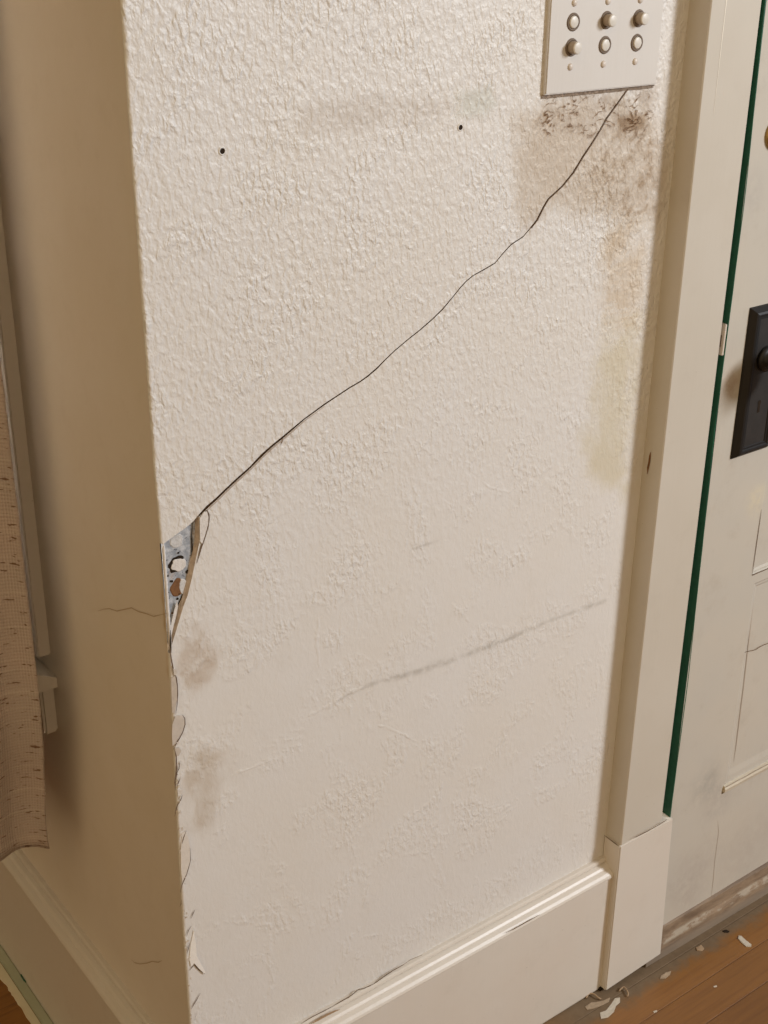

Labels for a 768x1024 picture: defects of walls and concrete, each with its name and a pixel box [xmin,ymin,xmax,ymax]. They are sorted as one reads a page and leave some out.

crack [197,90,628,562]
spalling [161,509,208,1021]